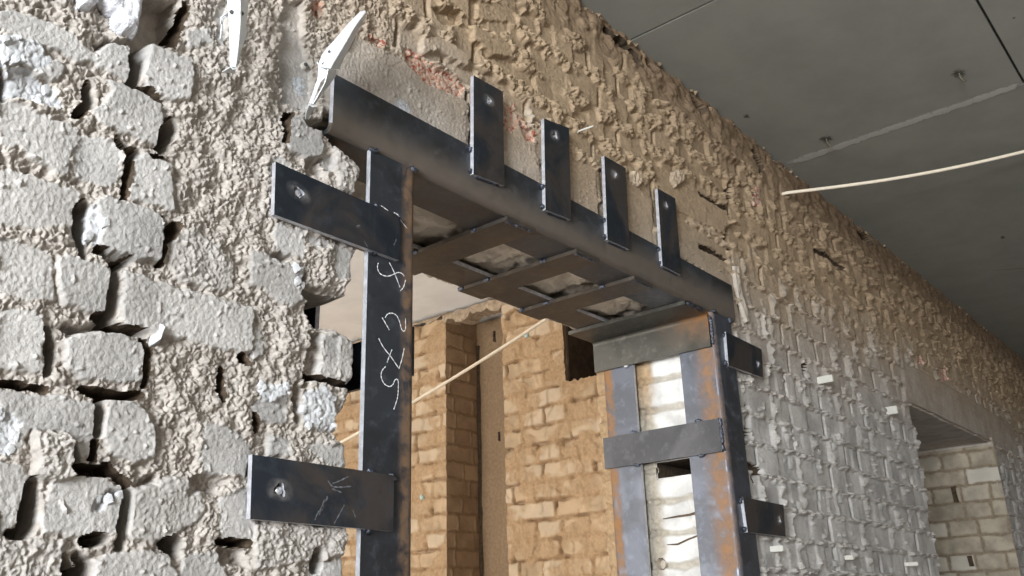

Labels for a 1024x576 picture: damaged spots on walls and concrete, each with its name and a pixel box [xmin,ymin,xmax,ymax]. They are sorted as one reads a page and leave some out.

spalling [310,0,325,19]
spalling [0,34,62,110]
spalling [403,48,465,98]
spalling [71,204,110,248]
spalling [291,262,305,290]
crack [813,248,845,271]
spalling [148,324,165,347]
spalling [257,380,337,432]
spalling [0,407,24,457]
spalling [92,488,123,513]